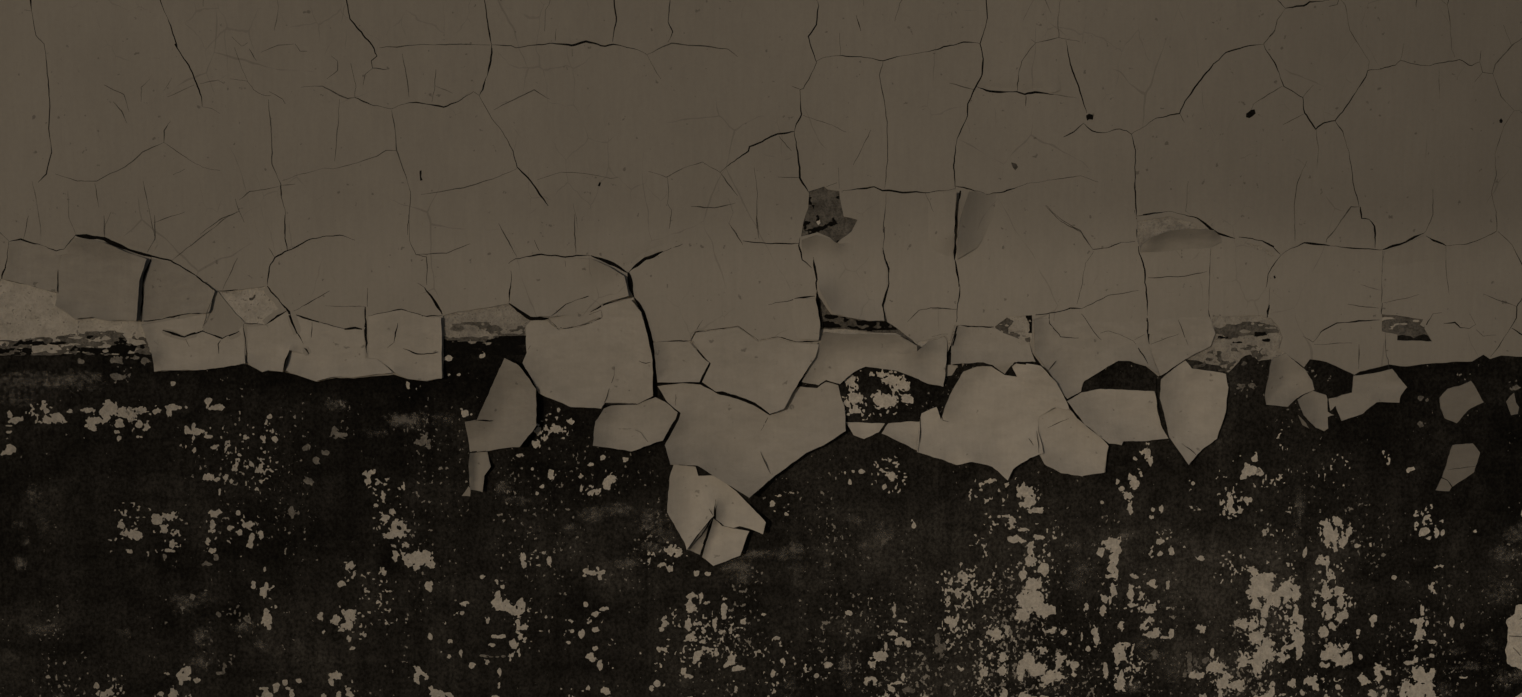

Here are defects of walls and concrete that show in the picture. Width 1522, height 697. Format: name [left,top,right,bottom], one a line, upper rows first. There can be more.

peeling [0,187,1483,697]
crack [0,0,1522,474]
peeling [1506,380,1521,415]
peeling [1505,604,1522,670]